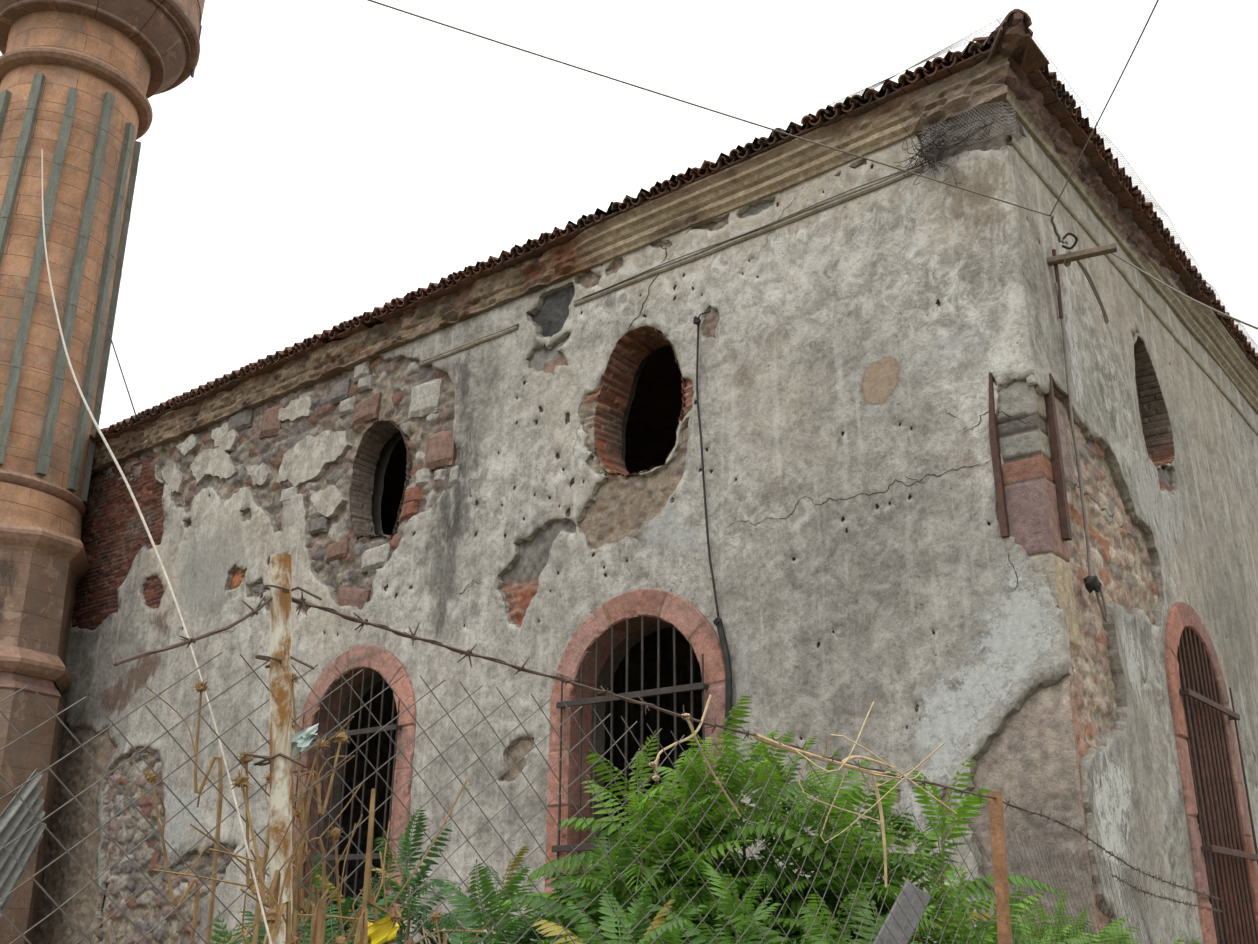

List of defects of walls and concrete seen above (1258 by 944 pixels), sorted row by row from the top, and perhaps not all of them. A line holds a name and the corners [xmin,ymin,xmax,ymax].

spalling [516,257,624,399]
spalling [71,355,460,631]
spalling [497,375,713,627]
crack [723,459,992,529]
spalling [938,378,1164,944]
spalling [33,722,238,944]